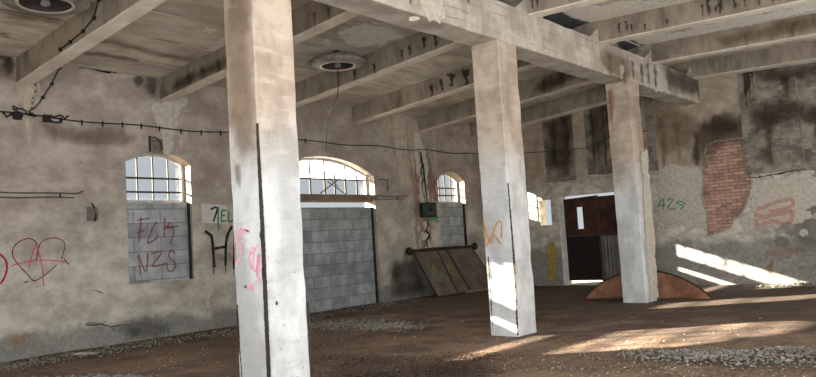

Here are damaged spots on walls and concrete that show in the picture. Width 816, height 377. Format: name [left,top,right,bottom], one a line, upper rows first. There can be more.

peeling [409,0,446,26]
leakage [701,0,723,16]
leakage [549,117,571,171]
leakage [590,104,609,161]
leakage [743,66,816,160]
crack [417,150,431,248]
flaking render [701,138,754,243]